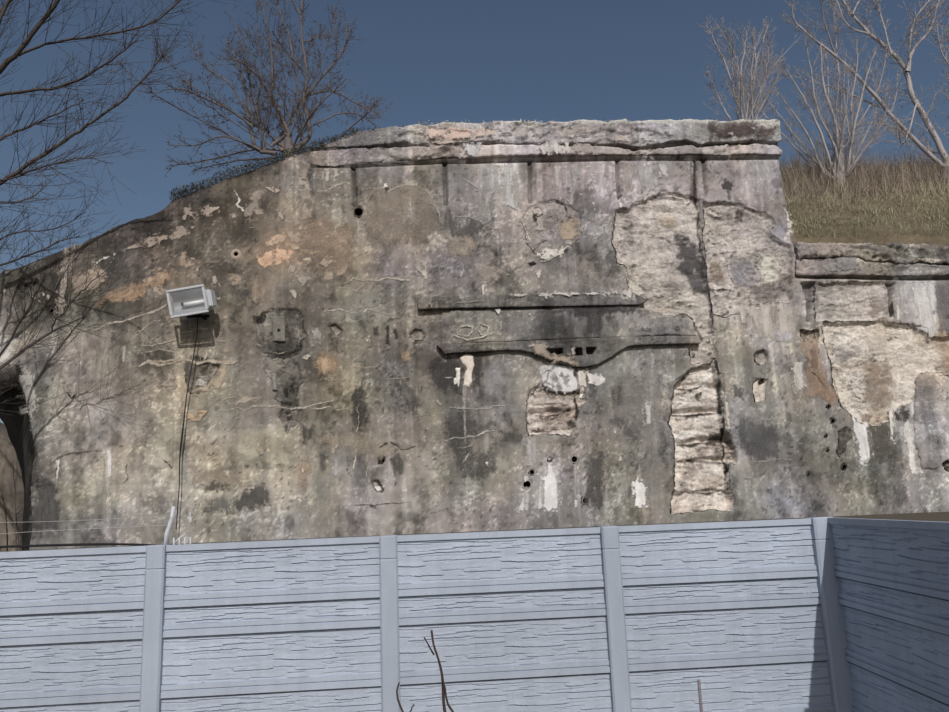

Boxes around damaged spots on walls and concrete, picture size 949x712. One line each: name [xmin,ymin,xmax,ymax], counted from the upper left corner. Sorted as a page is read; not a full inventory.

peeling [71,253,115,294]
peeling [127,163,352,433]
damp [302,381,406,476]
damp [429,354,495,478]
spalling [521,159,793,514]
crack [679,161,714,323]
spalling [800,243,949,458]